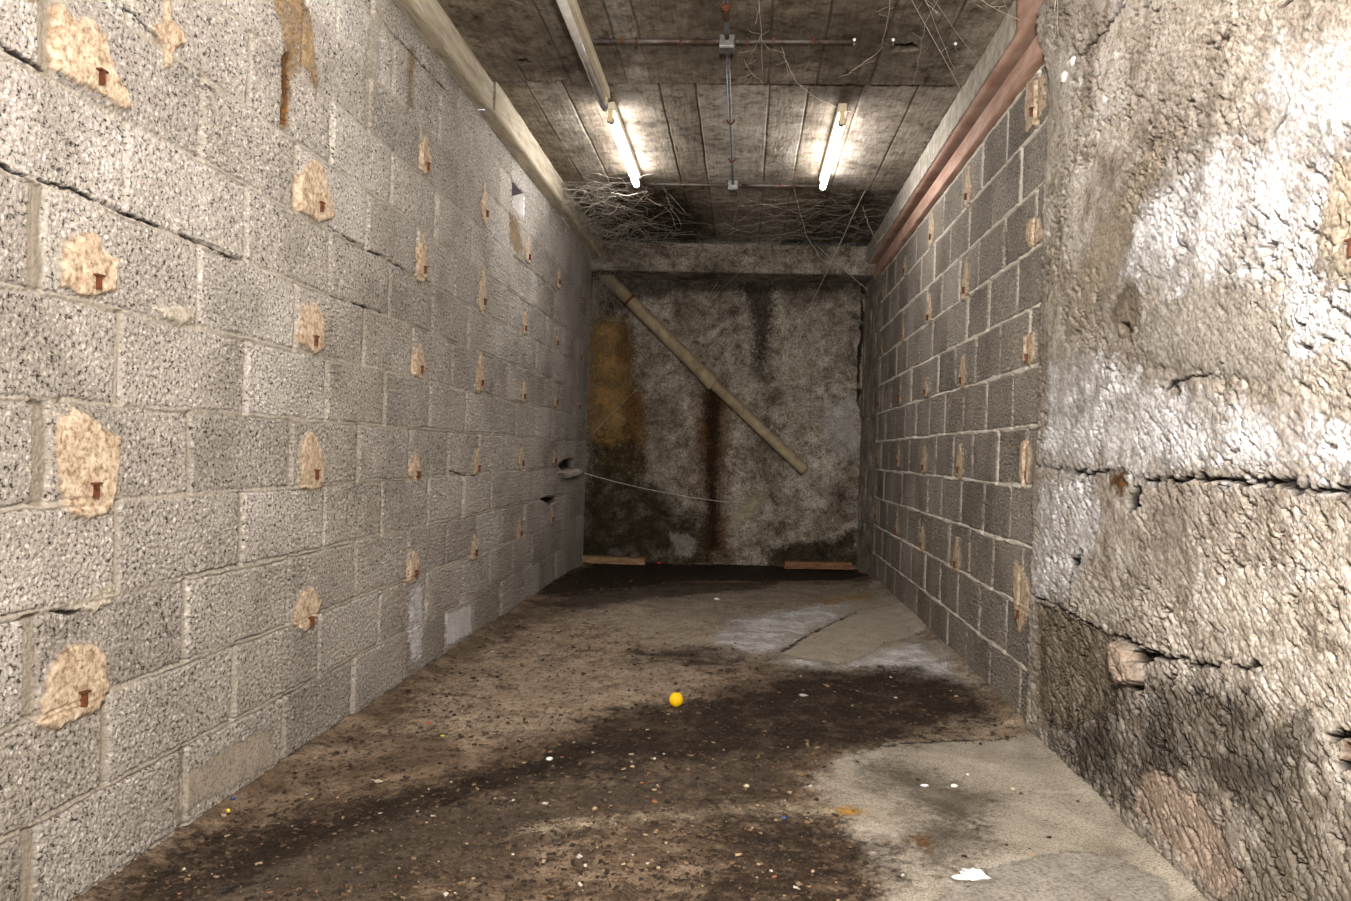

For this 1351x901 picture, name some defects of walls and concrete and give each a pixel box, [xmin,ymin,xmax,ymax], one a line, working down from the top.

rust [274,0,318,129]
crack [1168,373,1212,396]
water stain [540,427,868,608]
crack [1039,466,1110,477]
crack [1140,472,1351,500]
water stain [631,596,862,666]
water stain [143,644,995,901]
water stain [1071,684,1317,901]
spalling [1335,731,1351,770]